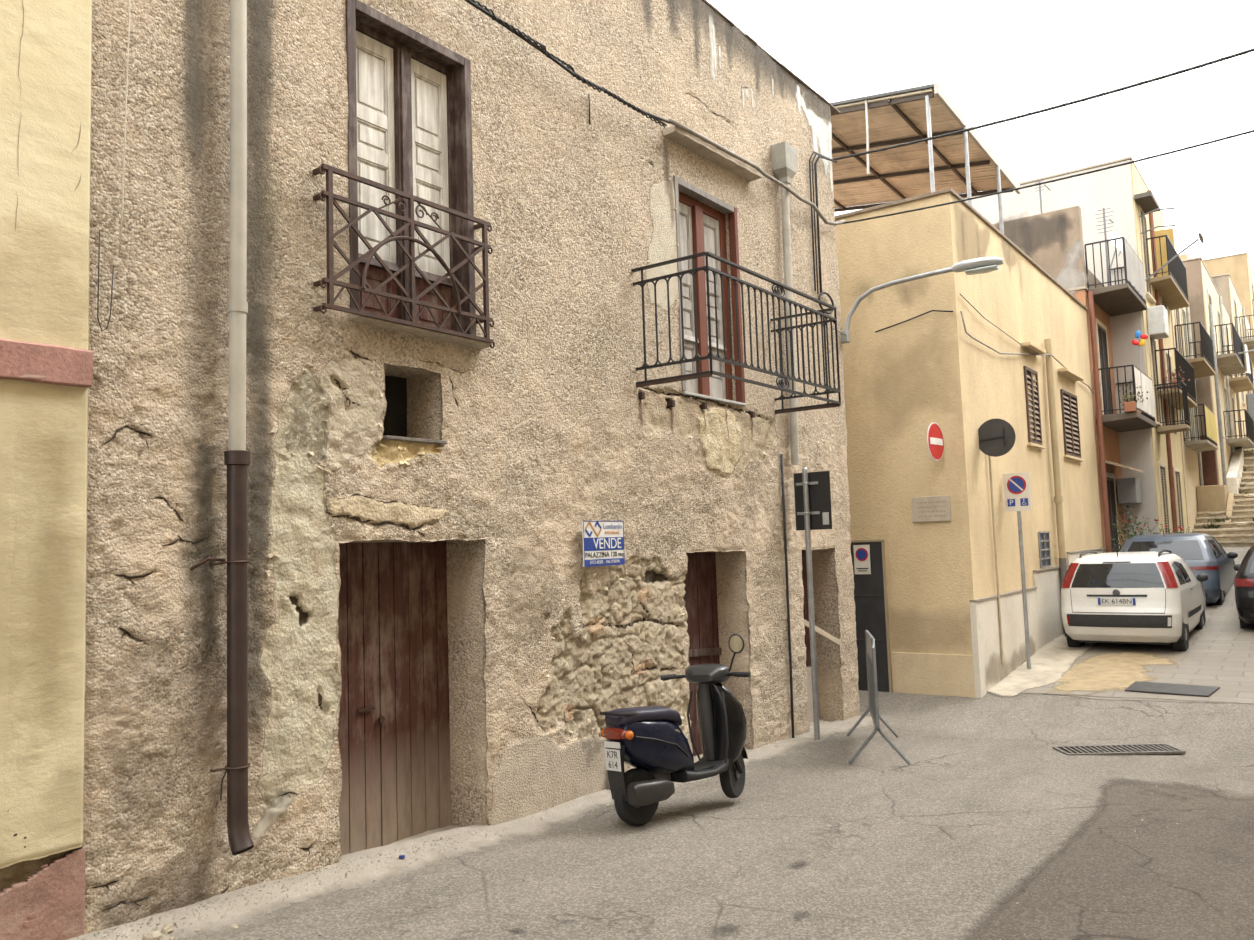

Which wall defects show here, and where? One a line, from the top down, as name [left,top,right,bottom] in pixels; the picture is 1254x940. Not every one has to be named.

spalling [643,388,777,479]
flaking render [257,353,450,809]
spalling [535,556,690,765]
spalling [0,833,117,940]
spalling [104,893,157,910]